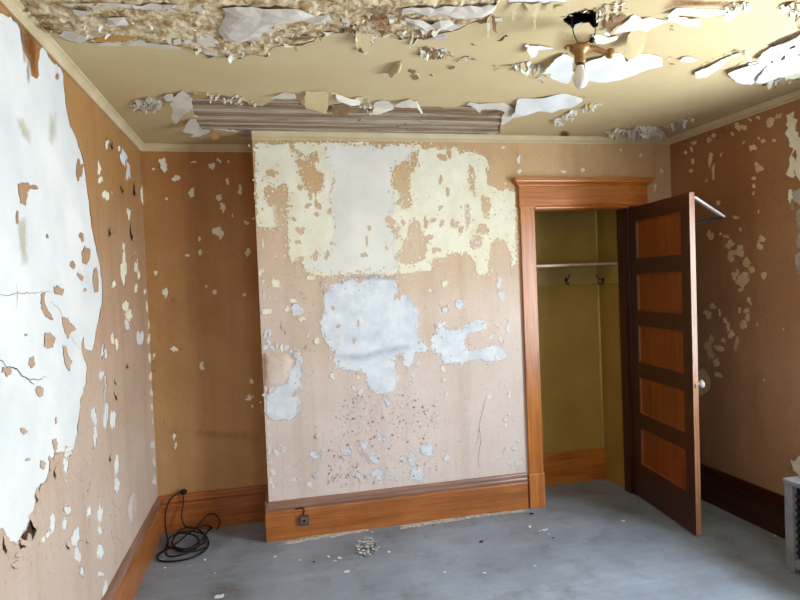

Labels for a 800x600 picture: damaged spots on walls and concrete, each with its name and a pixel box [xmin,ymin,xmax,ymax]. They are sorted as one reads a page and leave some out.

flaking render [20,0,800,90]
peeling [705,110,800,275]
peeling [0,11,158,578]
peeling [129,90,604,489]
spalling [698,229,767,397]